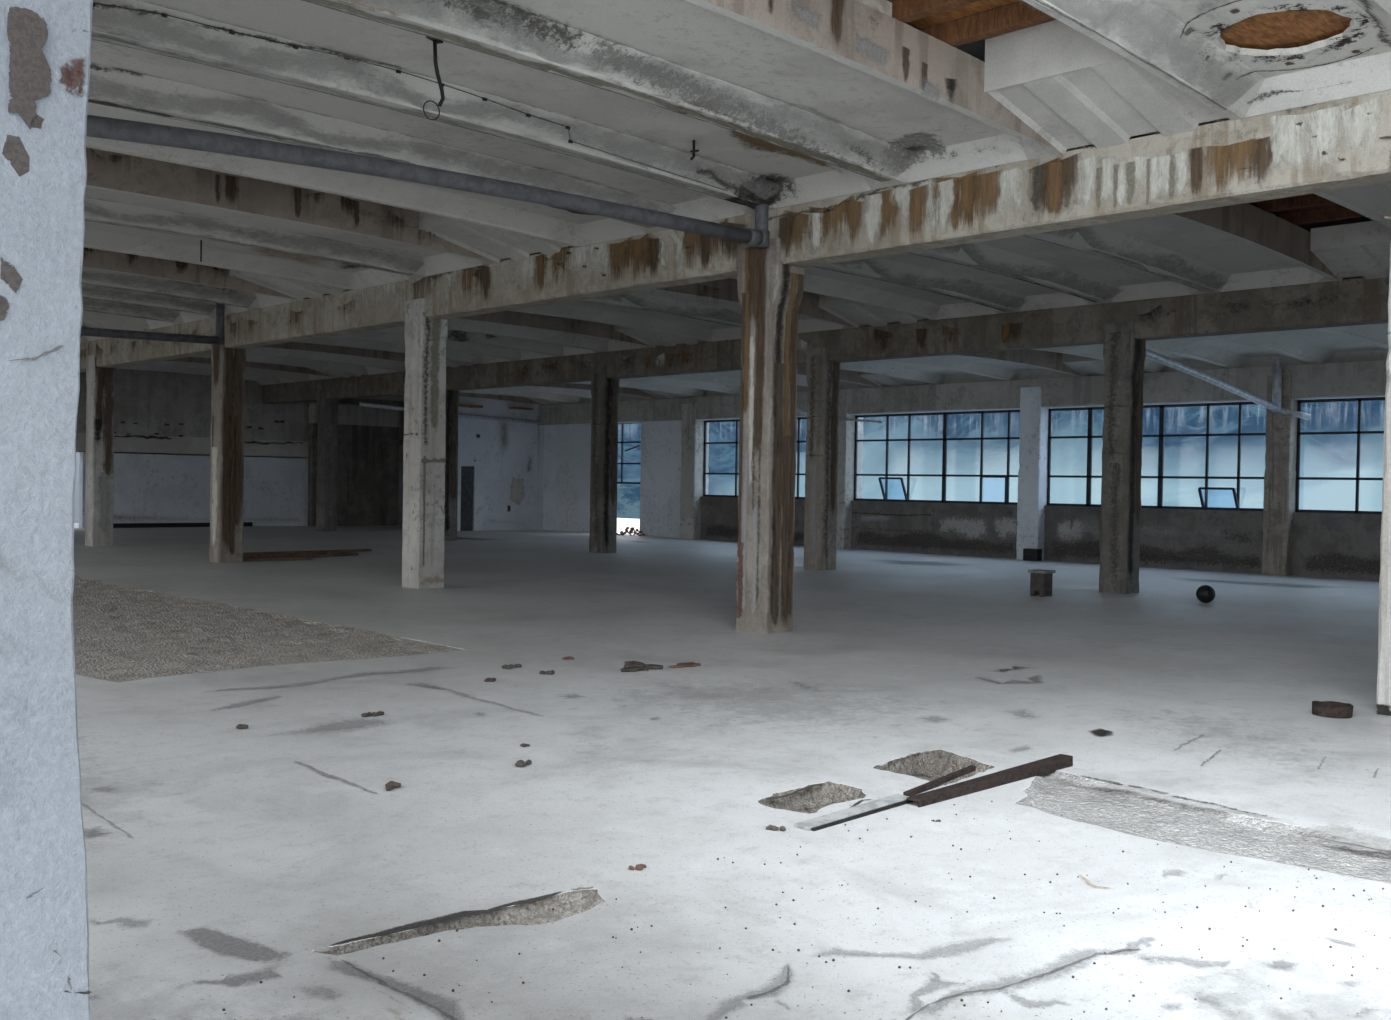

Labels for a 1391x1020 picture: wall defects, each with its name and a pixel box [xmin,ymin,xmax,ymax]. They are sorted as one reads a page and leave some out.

corrosion [831,0,844,41]
peeling [2,7,85,177]
corrosion [1030,154,1077,214]
corrosion [1190,136,1274,193]
corrosion [610,233,661,276]
peeling [0,258,23,321]
spalling [873,749,995,786]
crack [83,804,132,838]
spalling [758,781,871,814]
crack [332,960,461,1020]
crack [709,964,792,1020]
crack [822,937,1154,1020]